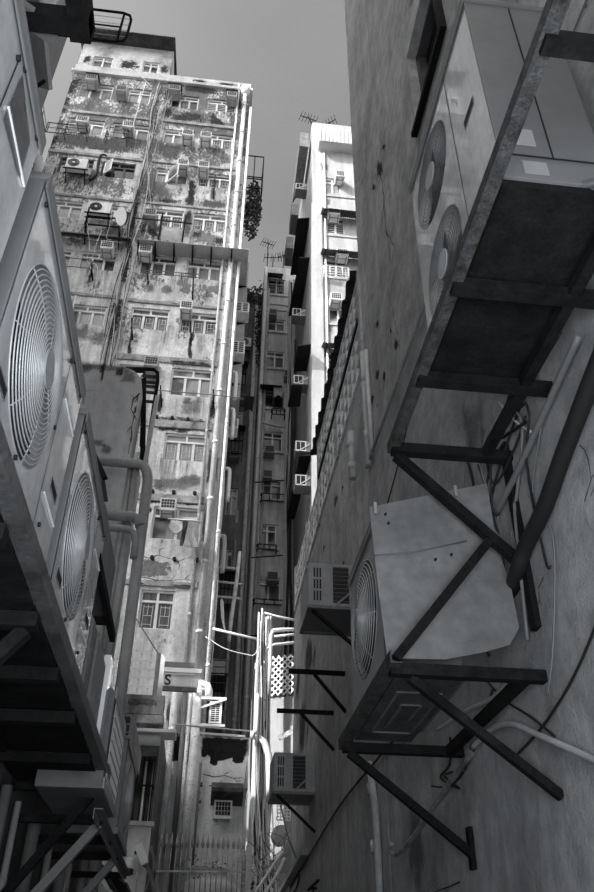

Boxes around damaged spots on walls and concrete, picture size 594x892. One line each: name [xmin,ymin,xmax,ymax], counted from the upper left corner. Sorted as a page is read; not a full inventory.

leakage [185,79,236,94]
leakage [162,90,226,125]
leakage [50,118,142,154]
leakage [161,145,179,159]
leakage [184,179,227,236]
leakage [96,189,141,282]
leakage [76,293,123,344]